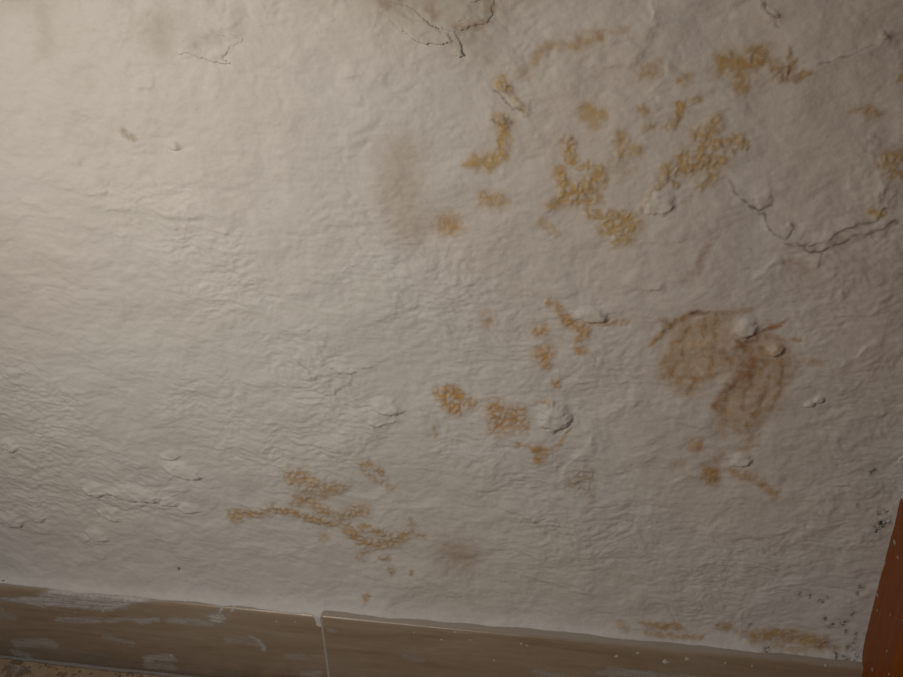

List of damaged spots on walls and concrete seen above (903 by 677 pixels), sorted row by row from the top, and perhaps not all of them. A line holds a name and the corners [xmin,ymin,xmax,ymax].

damp [463,115,508,169]
damp [550,140,635,243]
damp [229,472,407,558]